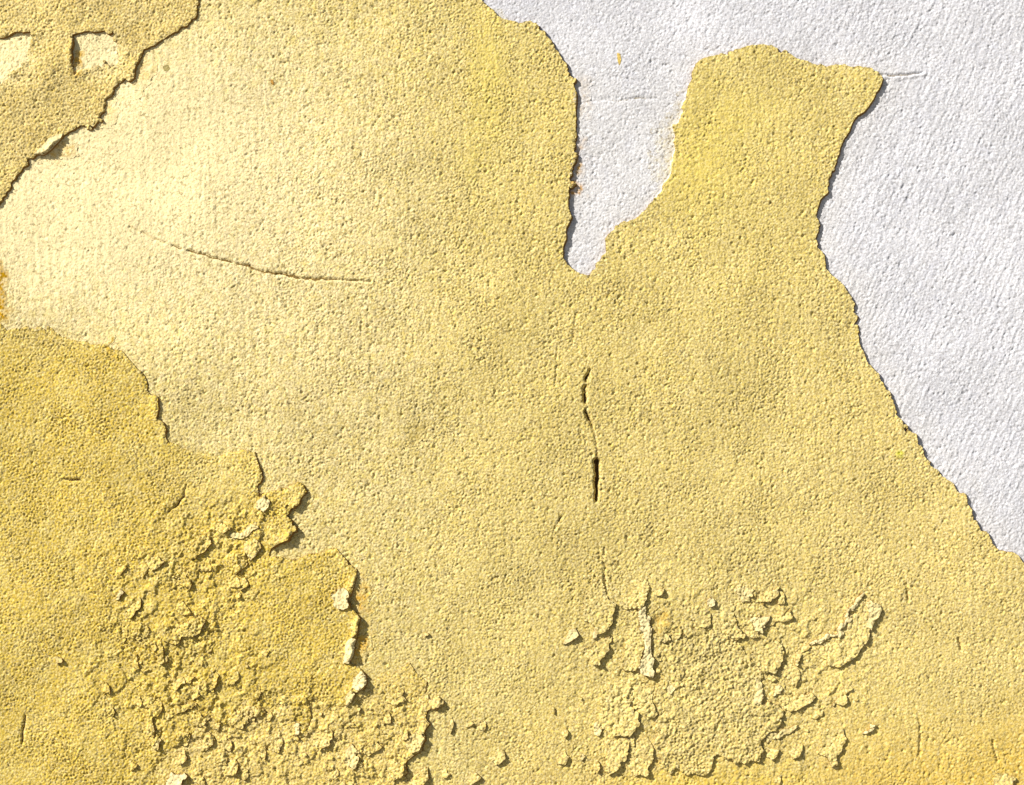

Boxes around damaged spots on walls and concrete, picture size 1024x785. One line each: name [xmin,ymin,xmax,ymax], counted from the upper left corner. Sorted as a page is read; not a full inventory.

crack [147,235,370,282]
spalling [482,0,1024,563]
peeling [0,0,487,785]
crack [584,374,599,501]
peeling [489,749,506,765]
peeling [557,578,882,776]